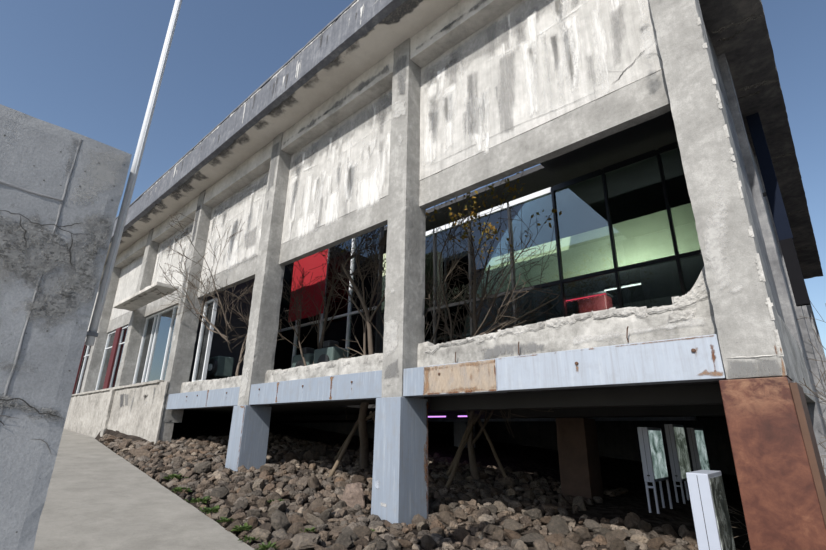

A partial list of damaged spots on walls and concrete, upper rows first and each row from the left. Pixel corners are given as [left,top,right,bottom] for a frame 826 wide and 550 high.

water stain [424,0,580,163]
water stain [592,3,609,90]
water stain [289,56,406,238]
crack [1,210,89,265]
spalling [425,266,710,363]
corrosion [621,335,723,376]
crack [0,398,64,425]
corrosion [424,358,501,518]